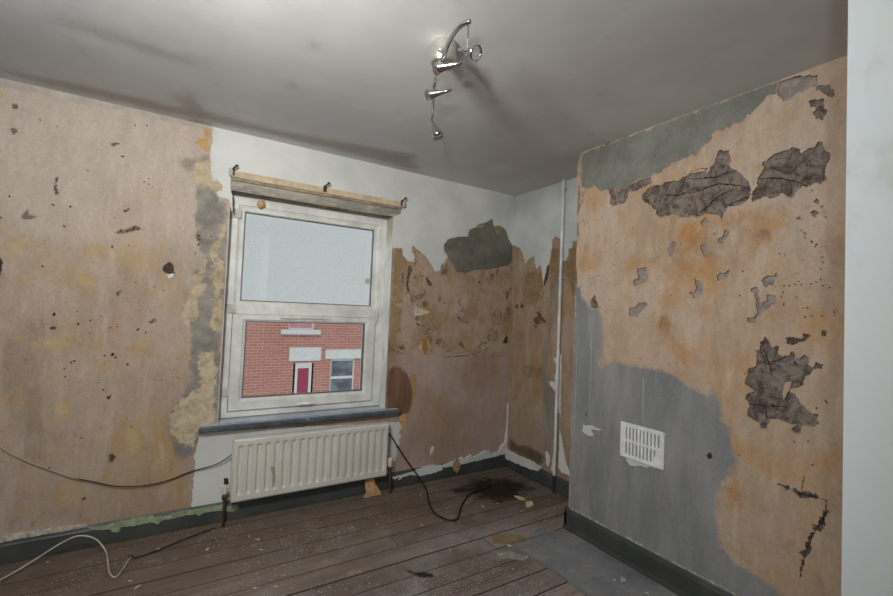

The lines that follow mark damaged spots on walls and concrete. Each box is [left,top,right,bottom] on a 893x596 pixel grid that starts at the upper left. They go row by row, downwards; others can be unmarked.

flaking render [777,75,835,120]
flaking render [609,142,831,247]
damp [385,248,417,416]
flaking render [630,302,648,317]
flaking render [748,256,830,323]
flaking render [744,333,828,443]
peeling [90,424,356,532]
peeling [387,422,402,473]
peeling [545,430,570,476]
crack [777,476,829,578]